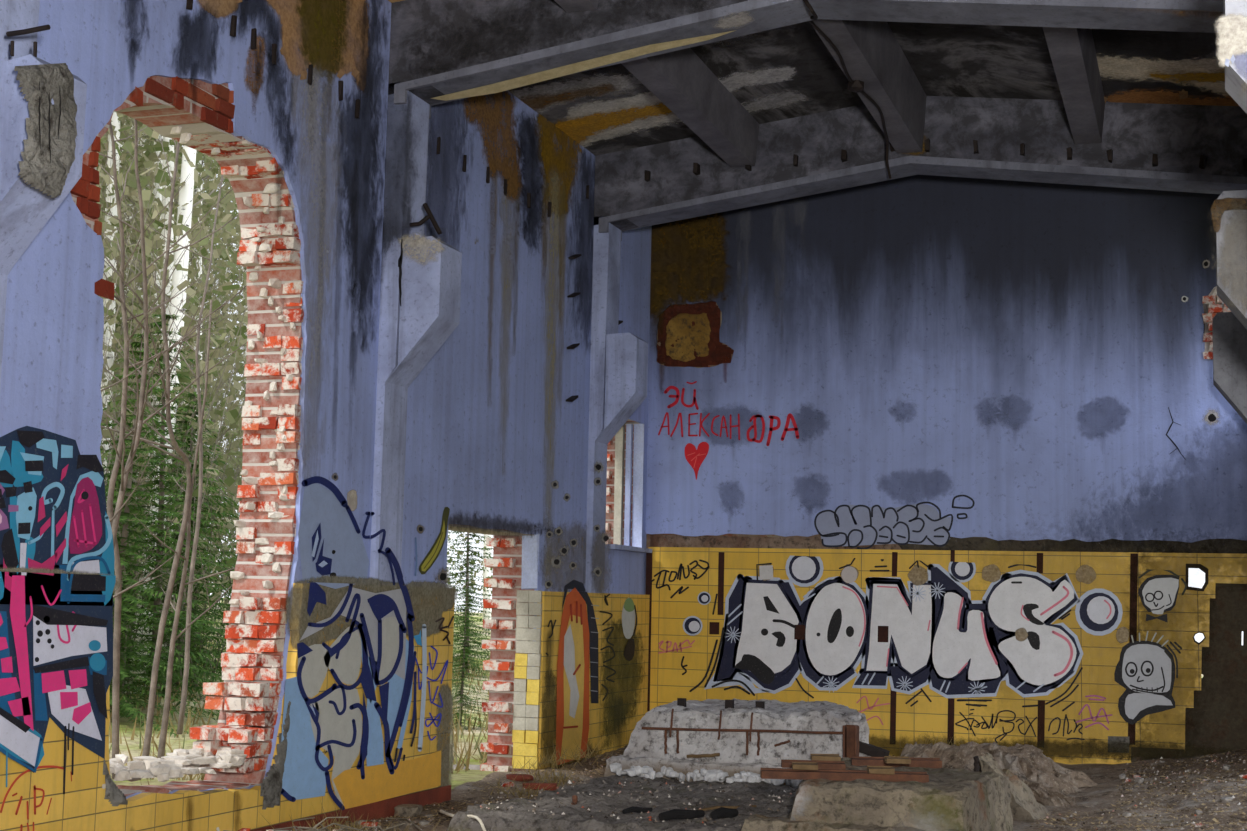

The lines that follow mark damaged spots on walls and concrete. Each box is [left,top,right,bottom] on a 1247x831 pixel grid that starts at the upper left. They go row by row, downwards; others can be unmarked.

peeling [198,0,242,18]
peeling [267,0,369,91]
leakage [712,12,761,47]
flaking render [130,37,265,133]
leakage [719,67,806,113]
peeling [1104,89,1239,106]
spalling [14,63,102,235]
flaking render [94,279,114,301]
corrosion [464,84,672,452]
spalling [656,301,734,367]
crack [1166,407,1186,460]
spalling [260,701,291,810]